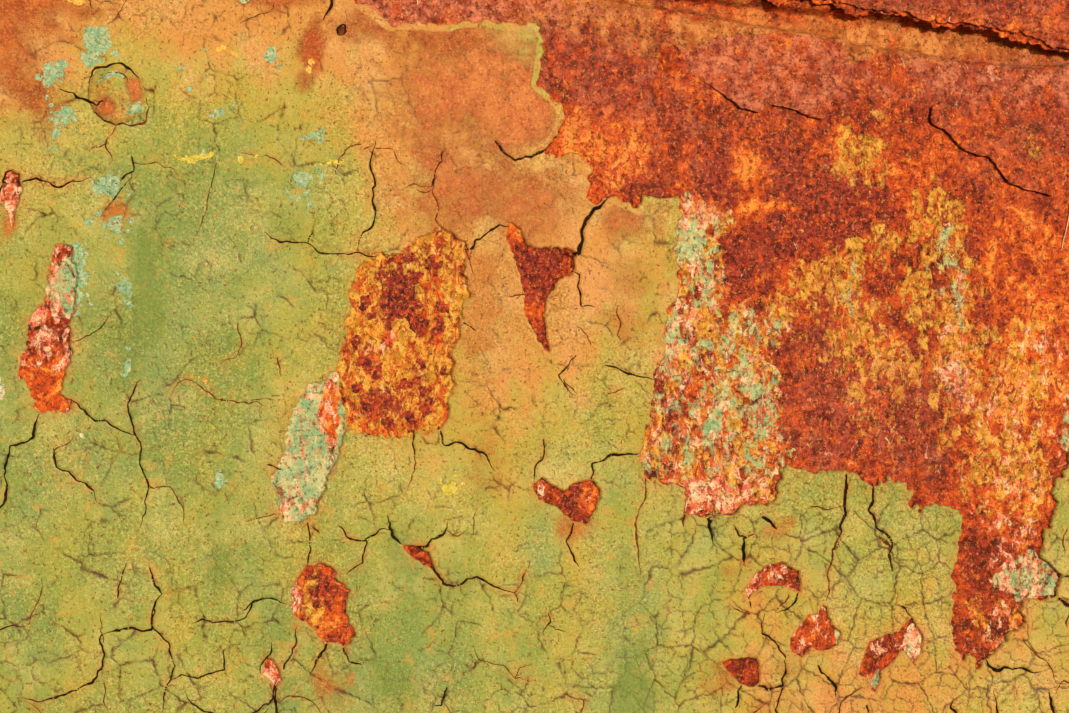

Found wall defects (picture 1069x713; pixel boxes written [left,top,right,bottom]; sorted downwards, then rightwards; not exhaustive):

corrosion [299,20,324,81]
corrosion [804,0,1069,53]
corrosion [403,27,570,236]
crack [265,141,443,257]
peeling [270,227,470,523]
crack [558,199,621,396]
peeling [355,0,1069,669]
crack [307,512,527,603]
crack [810,474,893,601]
crack [23,563,225,713]
peeling [723,657,759,687]
peeling [859,618,923,692]